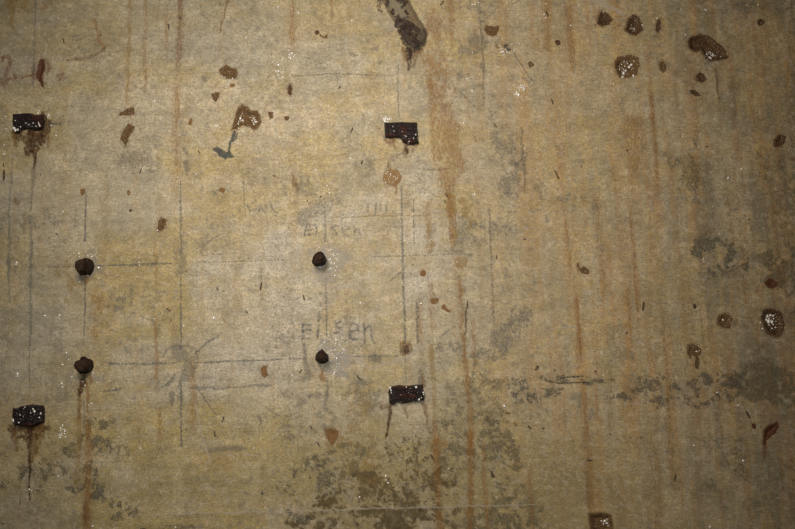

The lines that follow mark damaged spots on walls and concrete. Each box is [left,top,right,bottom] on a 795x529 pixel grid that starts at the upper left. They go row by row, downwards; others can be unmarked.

corrosion [377,0,455,96]
corrosion [12,111,51,169]
corrosion [385,126,417,154]
corrosion [383,165,402,193]
leakage [493,375,568,403]
leakage [609,357,795,409]
corrosion [8,423,49,500]
corrosion [77,373,92,529]
leakage [284,404,543,529]